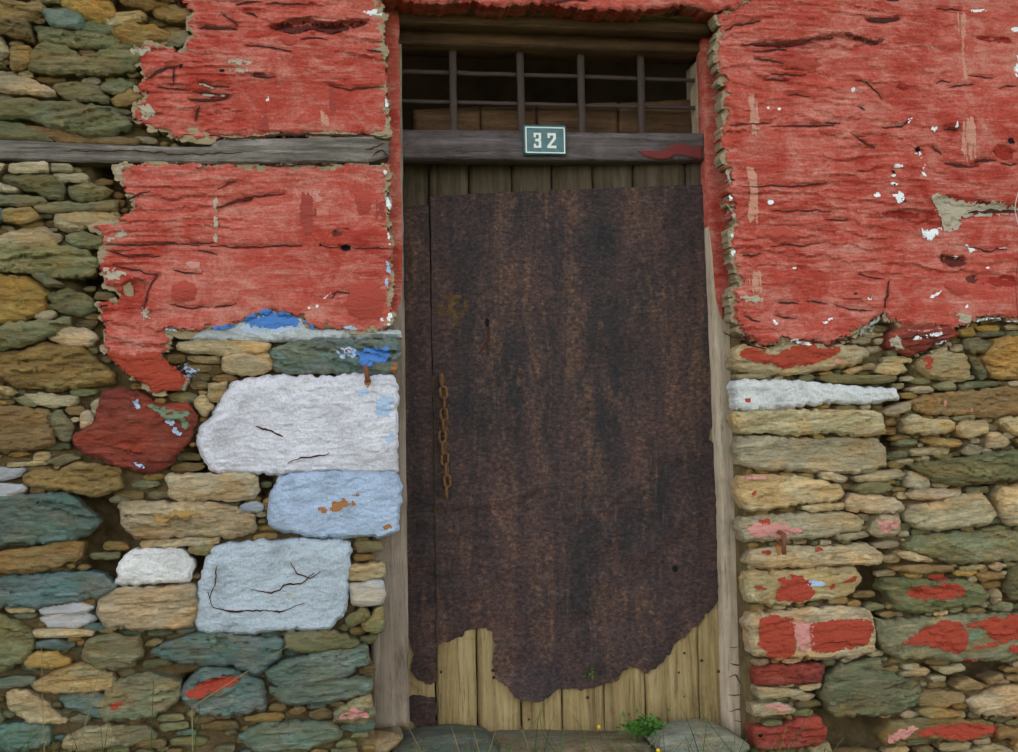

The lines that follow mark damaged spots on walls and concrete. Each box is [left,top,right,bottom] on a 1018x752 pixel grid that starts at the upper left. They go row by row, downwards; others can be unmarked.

spalling [874,152,1018,240]
spalling [940,244,975,267]
peeling [965,267,1018,290]
spalling [956,304,1017,323]
spalling [852,311,886,341]
spalling [889,335,904,351]
crack [208,563,320,613]